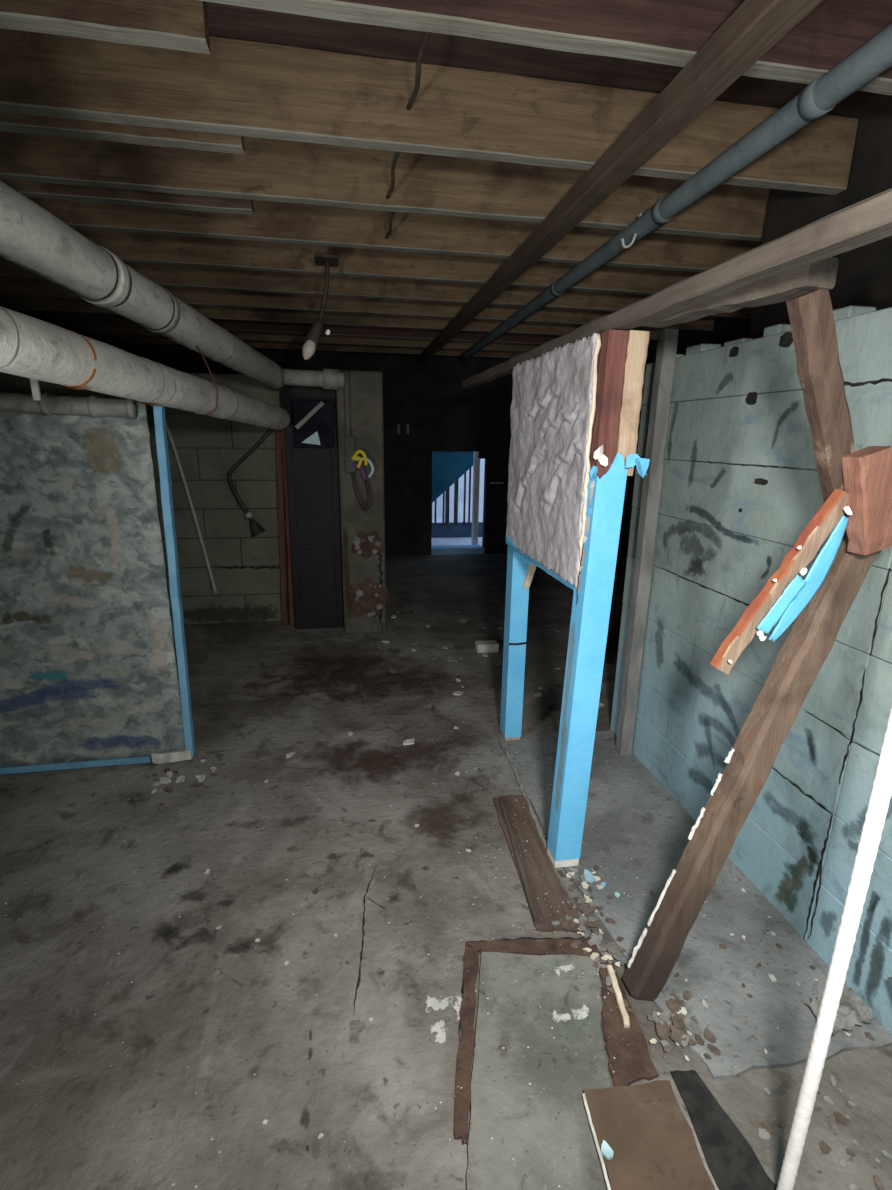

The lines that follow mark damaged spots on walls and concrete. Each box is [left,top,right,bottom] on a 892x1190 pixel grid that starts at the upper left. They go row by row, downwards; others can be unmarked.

crack [772,568,891,940]
crack [353,867,386,1015]